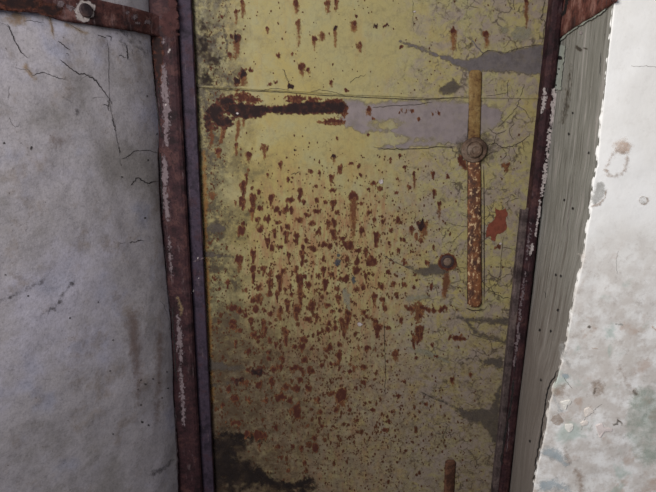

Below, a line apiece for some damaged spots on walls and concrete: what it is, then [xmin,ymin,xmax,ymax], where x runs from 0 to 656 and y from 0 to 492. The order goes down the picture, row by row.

rust [0,0,64,33]
rust [151,0,179,87]
crack [0,22,163,217]
peeling [339,98,469,150]
rust [203,0,476,492]
peeling [486,208,508,245]
peeling [526,87,557,260]
peeling [591,182,606,207]